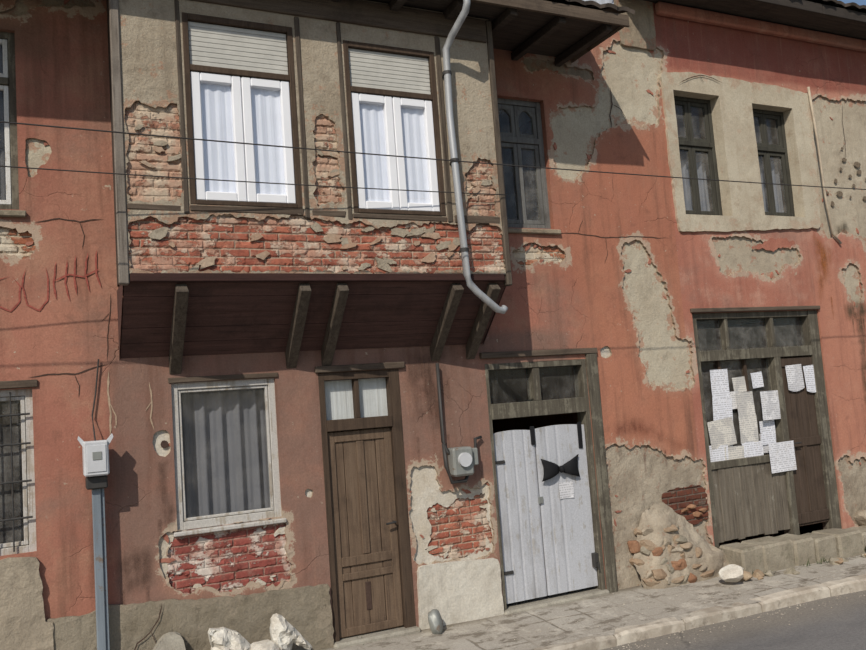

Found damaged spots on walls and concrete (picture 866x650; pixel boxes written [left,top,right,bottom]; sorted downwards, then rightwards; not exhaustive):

crack [34,218,102,249]
flaking render [124,102,182,202]
flaking render [312,114,344,206]
flaking render [128,159,565,274]
spalling [550,41,663,181]
crack [568,221,656,264]
spalling [812,96,866,245]
crack [29,294,117,435]
spalling [621,240,694,390]
spalling [158,520,292,594]
flaking render [409,465,493,564]
spalling [605,444,711,590]